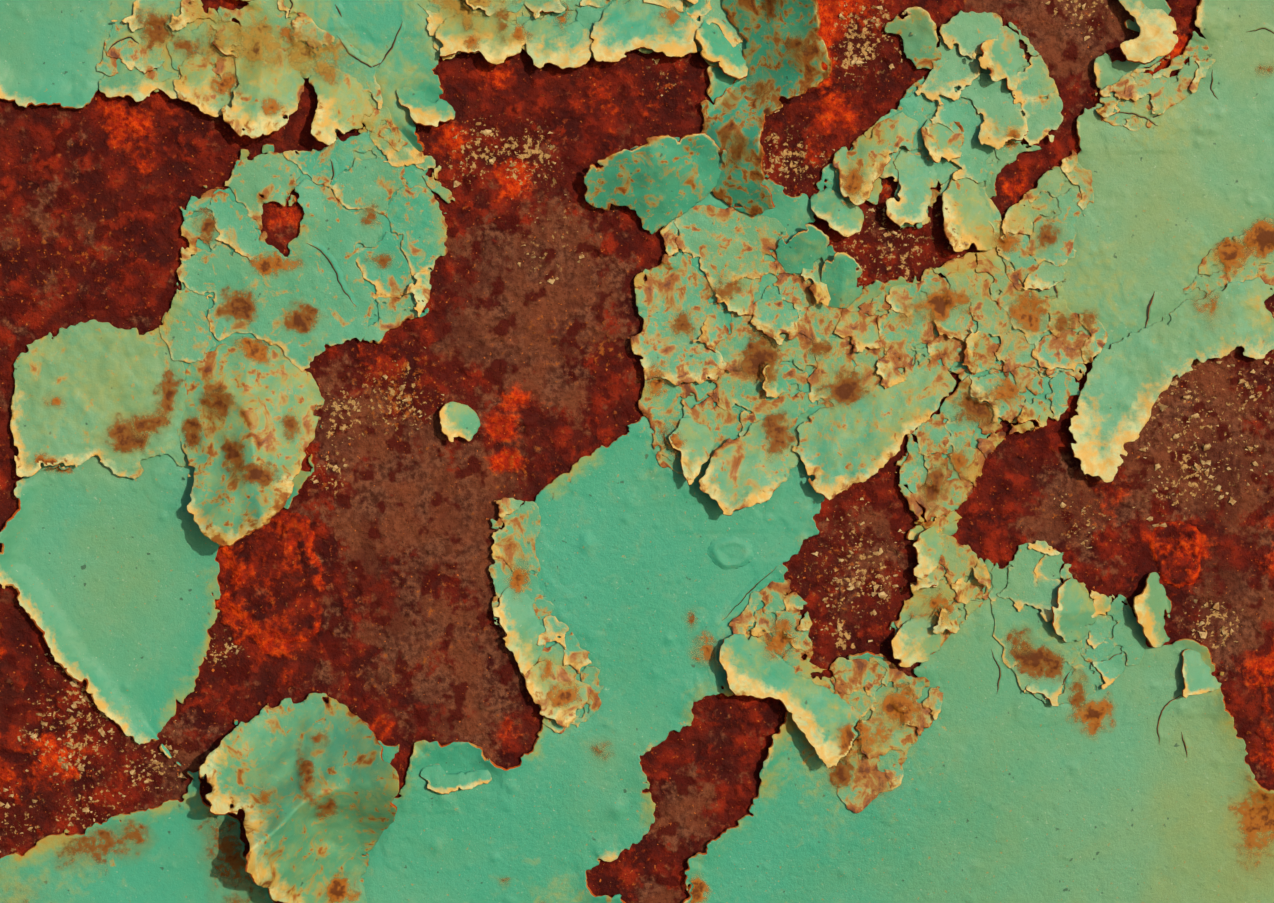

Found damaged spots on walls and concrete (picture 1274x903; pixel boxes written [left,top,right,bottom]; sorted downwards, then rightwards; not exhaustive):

rust [921,118,965,163]
crack [330,158,340,186]
rust [1216,217,1274,274]
crack [306,239,359,306]
rust [740,332,780,382]
rust [107,370,183,453]
rust [199,389,234,419]
rust [221,438,278,486]
rust [668,417,715,485]
rust [1007,630,1064,680]
rust [1069,681,1114,735]
rust [326,878,360,903]